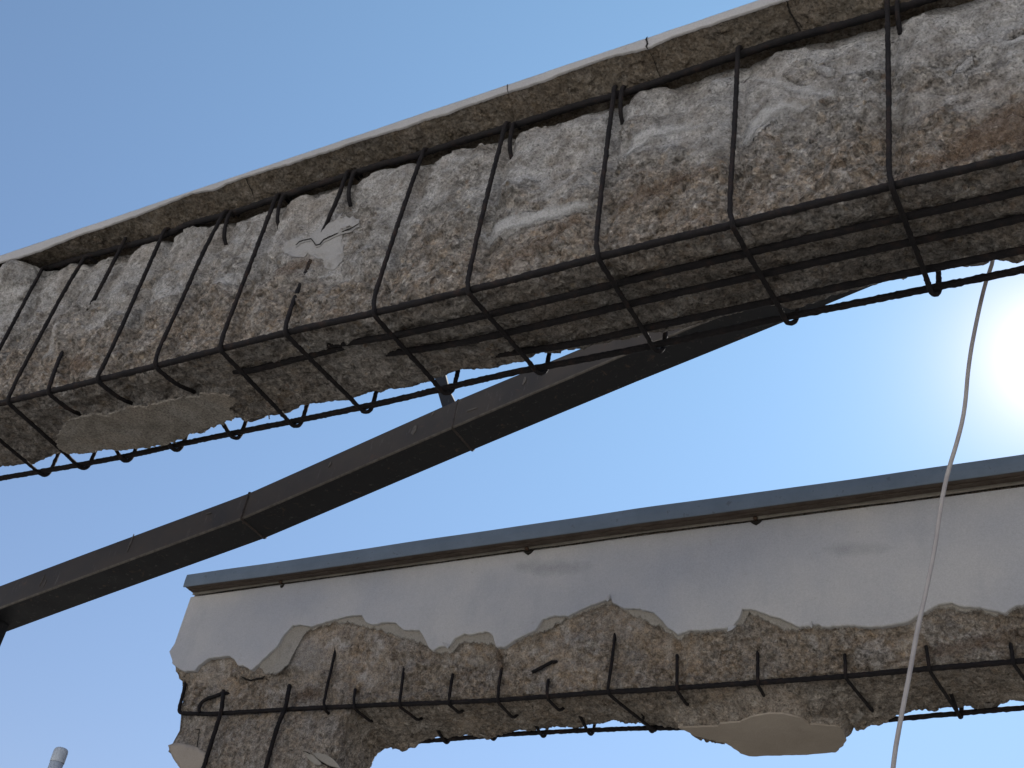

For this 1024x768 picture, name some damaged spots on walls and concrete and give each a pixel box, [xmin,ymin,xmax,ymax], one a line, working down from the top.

spalling [0,0,1024,481]
spalling [194,484,1024,597]
spalling [168,594,1024,768]